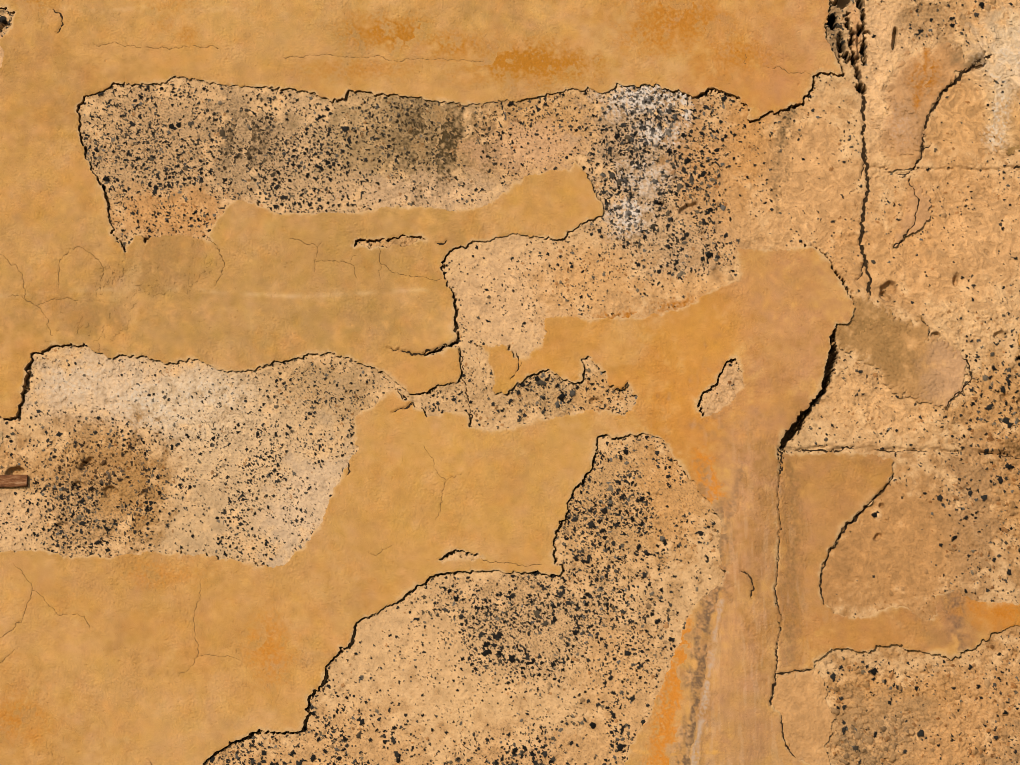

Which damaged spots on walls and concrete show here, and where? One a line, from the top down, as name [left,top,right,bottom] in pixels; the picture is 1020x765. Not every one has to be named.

spalling [636,90,684,131]
spalling [78,76,427,252]
spalling [102,355,216,393]
spalling [697,359,744,417]
spalling [204,433,726,765]